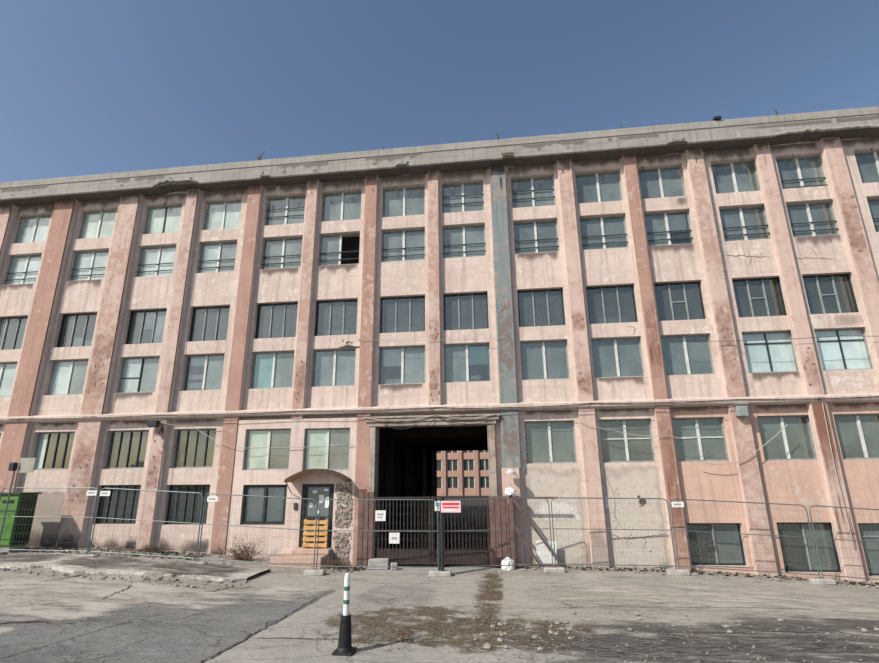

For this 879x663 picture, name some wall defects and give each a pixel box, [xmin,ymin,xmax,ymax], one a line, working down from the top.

spalling [153,177,198,188]
crack [608,480,666,547]